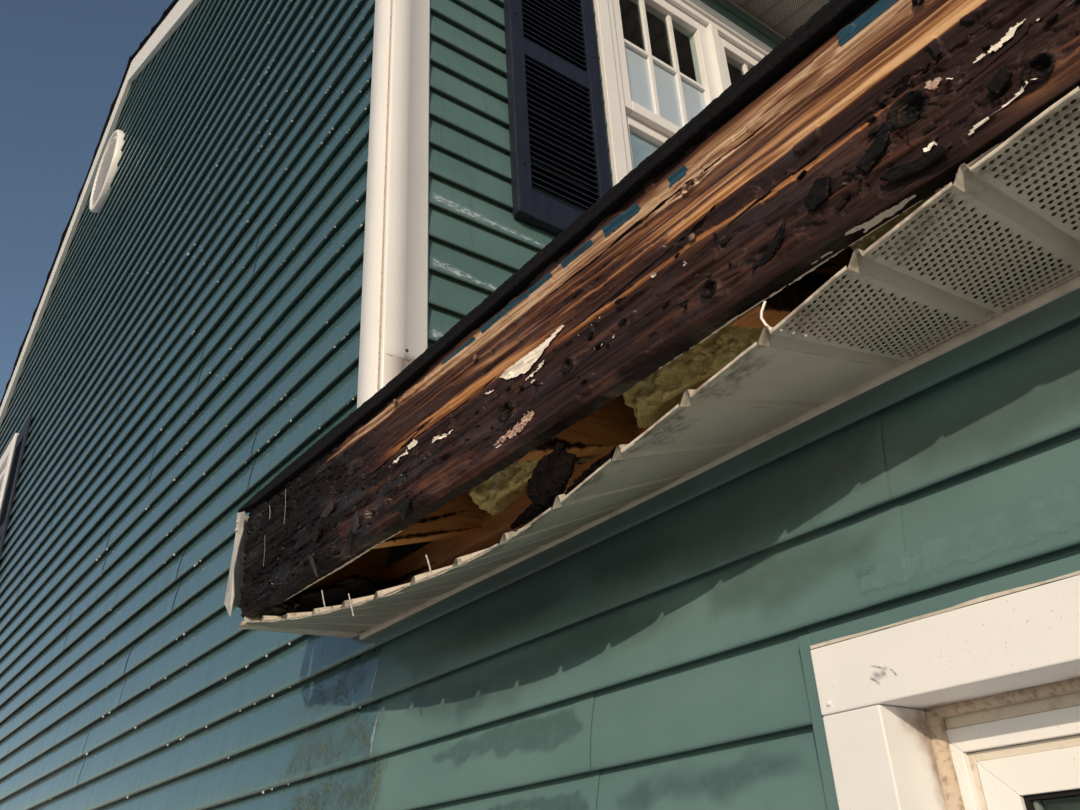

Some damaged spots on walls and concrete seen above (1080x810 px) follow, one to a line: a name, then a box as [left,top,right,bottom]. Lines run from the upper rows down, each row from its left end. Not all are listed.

peeling [973,0,1080,63]
peeling [924,77,953,92]
peeling [968,78,1037,136]
peeling [923,125,953,152]
peeling [659,195,922,369]
peeling [578,297,627,349]
peeling [485,325,564,394]
peeling [393,439,419,477]
peeling [464,410,534,448]
peeling [288,529,405,599]